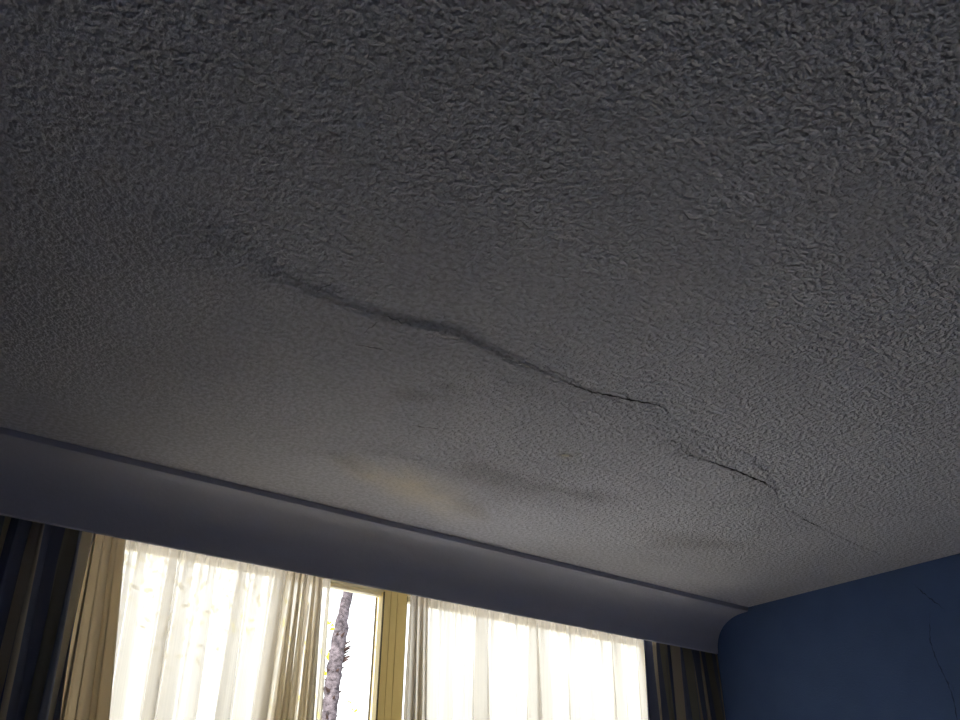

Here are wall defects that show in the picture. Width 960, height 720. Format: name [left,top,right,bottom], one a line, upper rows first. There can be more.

crack [574,385,659,406]
crack [678,452,769,487]